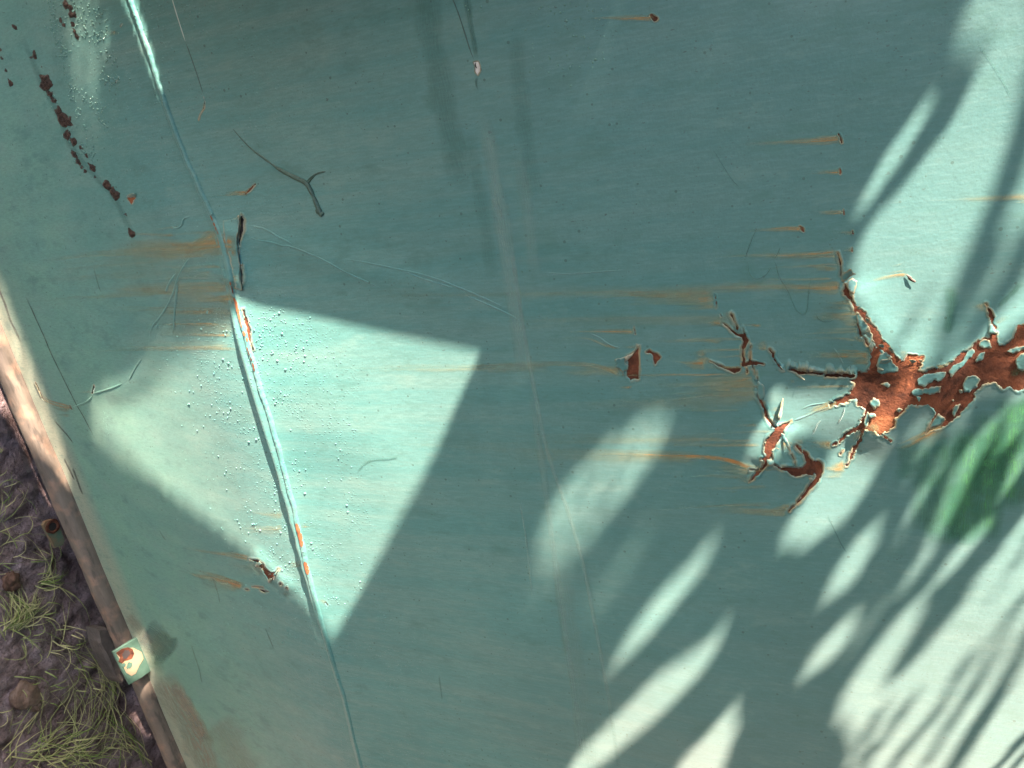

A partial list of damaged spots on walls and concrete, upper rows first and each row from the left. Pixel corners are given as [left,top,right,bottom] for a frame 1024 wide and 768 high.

rust [59,0,80,40]
rust [29,50,120,201]
rust [223,282,257,371]
peeling [592,324,663,388]
peeling [211,554,290,595]